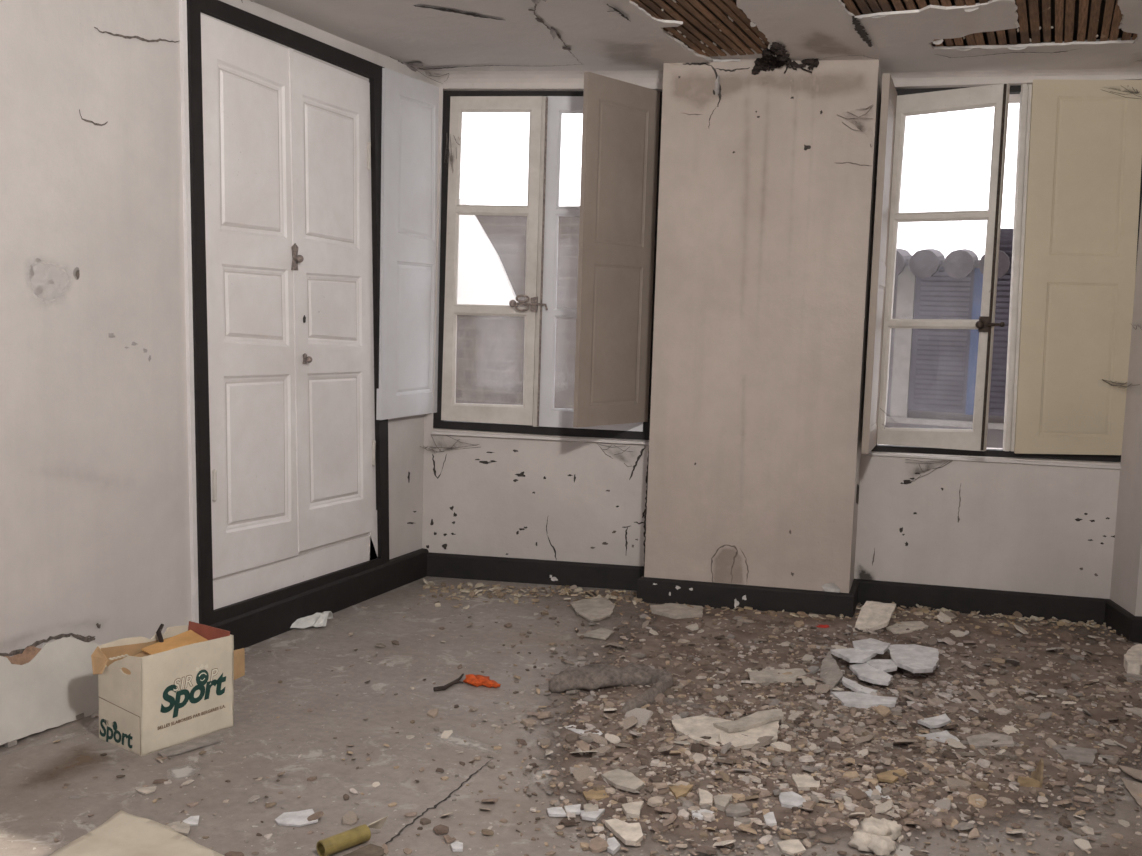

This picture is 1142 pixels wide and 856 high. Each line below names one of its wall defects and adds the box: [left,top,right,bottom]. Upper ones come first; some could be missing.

crack [414,5,503,20]
crack [528,0,582,66]
crack [390,56,512,72]
crack [683,62,750,127]
crack [79,109,108,126]
peeling [0,633,95,656]
crack [385,758,494,844]